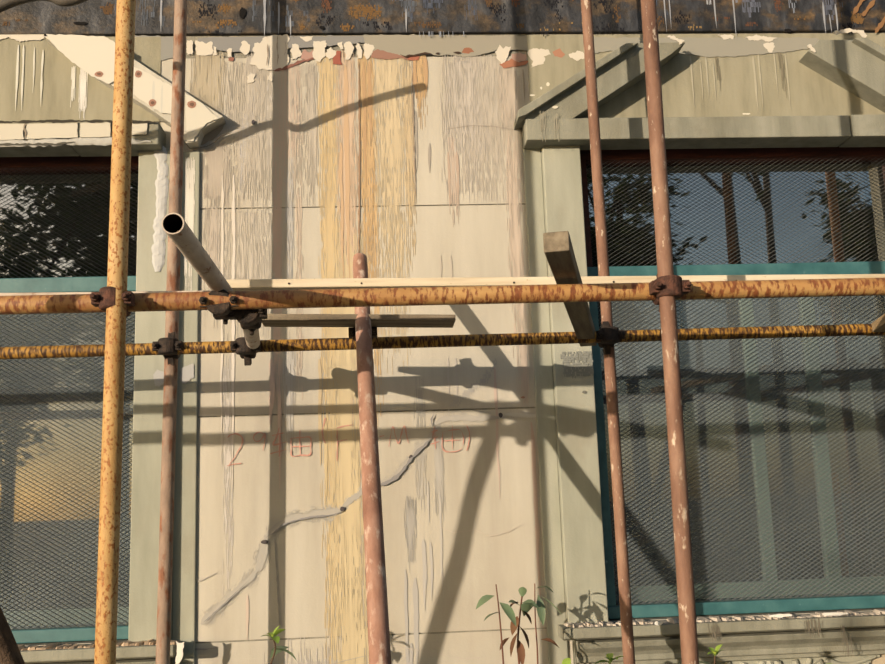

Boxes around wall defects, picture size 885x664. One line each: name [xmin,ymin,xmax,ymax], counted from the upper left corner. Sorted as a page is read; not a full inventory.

spalling [186,34,584,83]
spalling [594,37,643,53]
spalling [659,34,819,57]
crack [381,414,434,486]
crack [272,511,342,628]